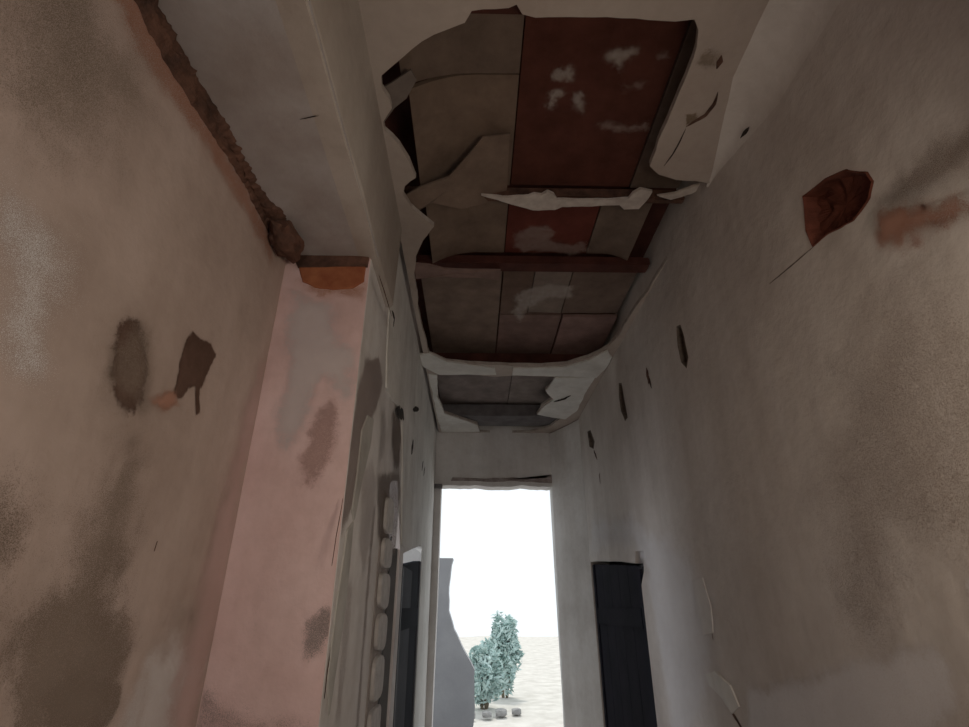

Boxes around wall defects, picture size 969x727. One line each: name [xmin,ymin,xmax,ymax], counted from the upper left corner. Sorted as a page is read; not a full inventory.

spalling [134,0,287,233]
peeling [545,60,585,114]
spalling [772,169,874,282]
peeling [82,308,216,450]
spalling [619,383,628,421]
spalling [676,325,688,368]
leakage [0,410,163,727]